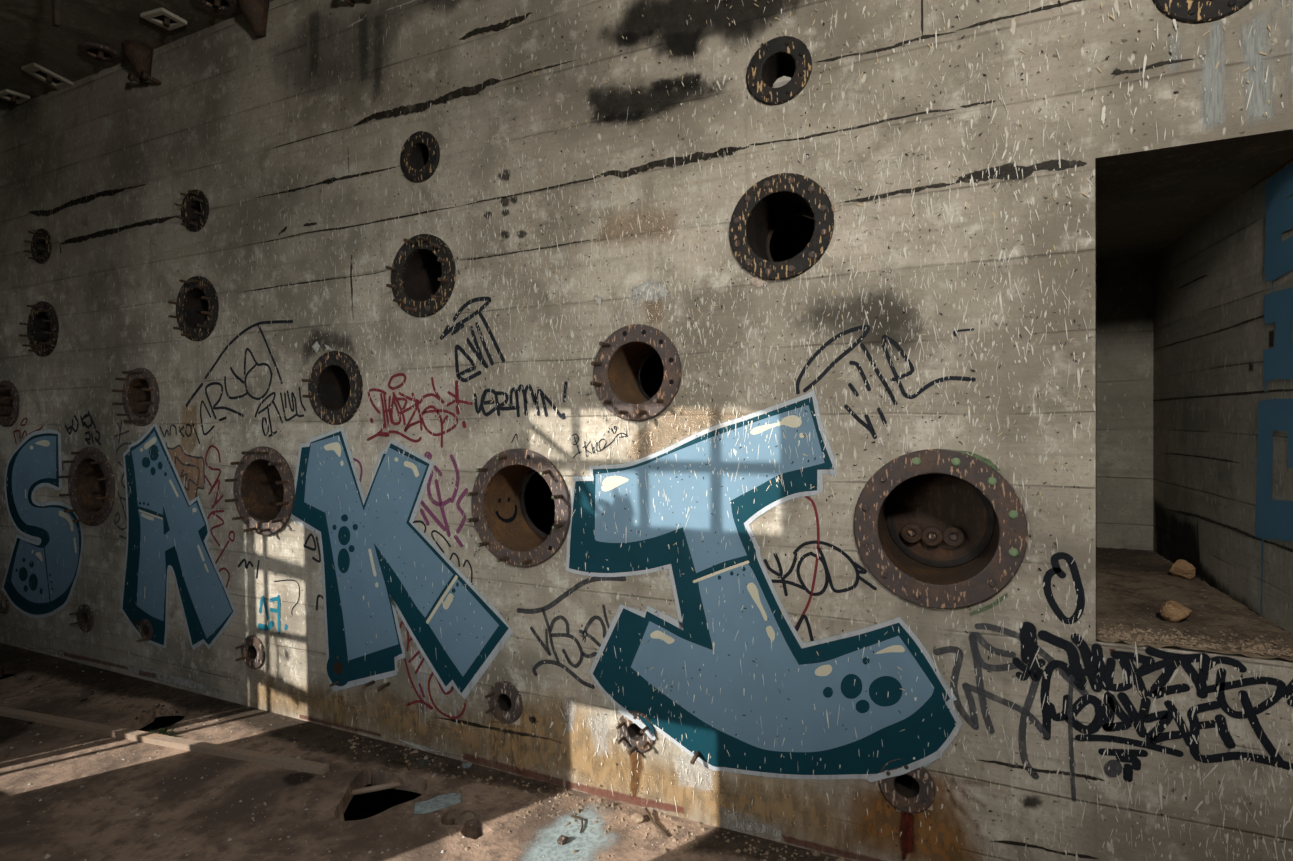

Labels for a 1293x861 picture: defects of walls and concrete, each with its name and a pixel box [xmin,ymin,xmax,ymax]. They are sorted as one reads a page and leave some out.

water stain [603,0,799,57]
water stain [590,74,718,122]
crack [255,60,574,198]
crack [239,100,995,315]
crack [840,159,1087,203]